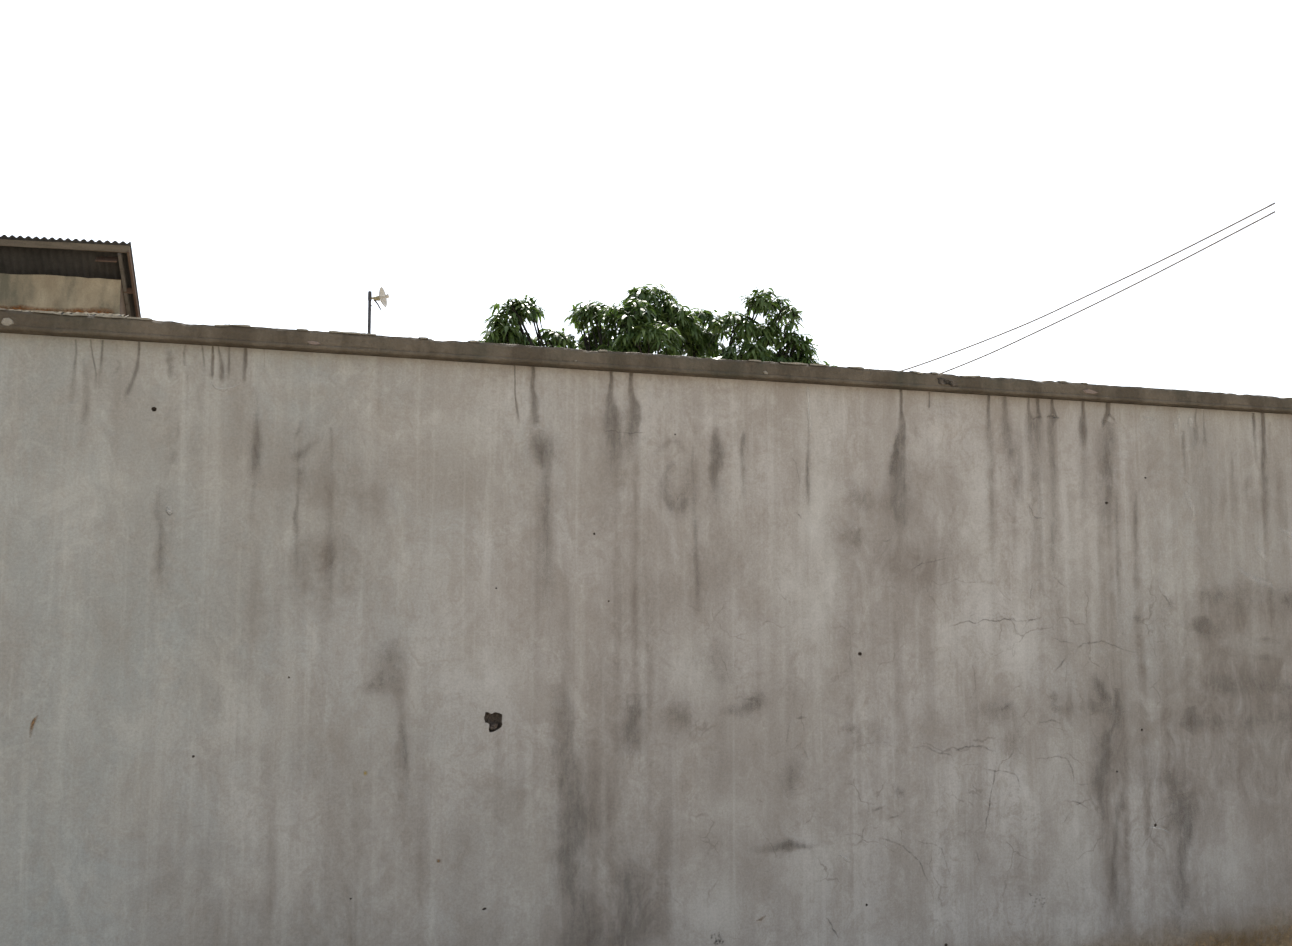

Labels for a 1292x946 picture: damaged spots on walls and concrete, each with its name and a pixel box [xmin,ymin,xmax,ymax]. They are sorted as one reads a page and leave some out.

damp [1253,413,1265,468]
spalling [484,712,502,732]